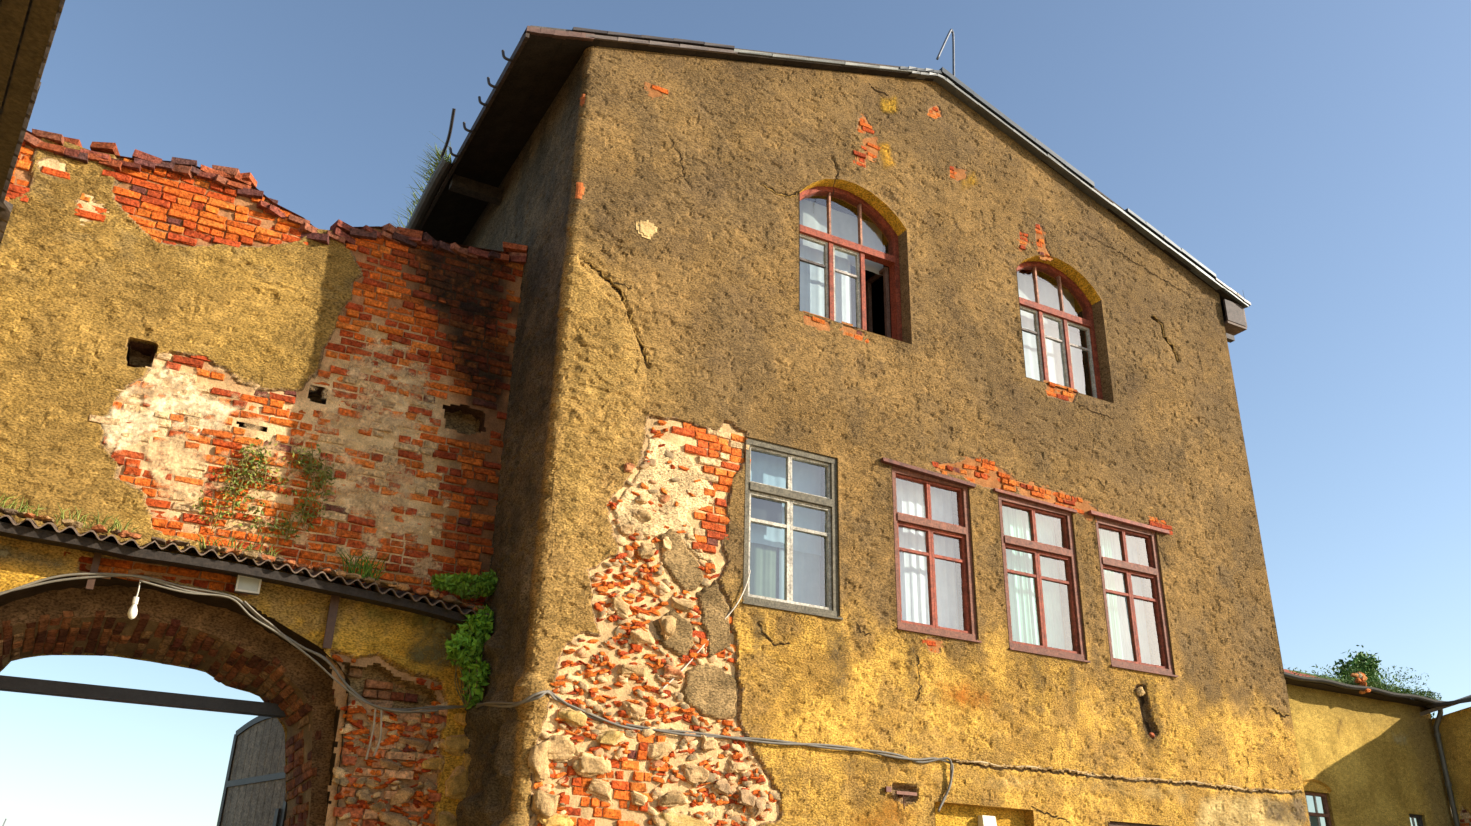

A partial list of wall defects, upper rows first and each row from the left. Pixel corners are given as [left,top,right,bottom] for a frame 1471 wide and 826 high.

spalling [853,113,880,168]
crack [580,258,649,368]
spalling [5,129,528,610]
spalling [932,456,1097,522]
spalling [1148,516,1173,535]
spalling [528,418,781,826]
spalling [325,652,471,826]
peeling [1200,798,1302,826]